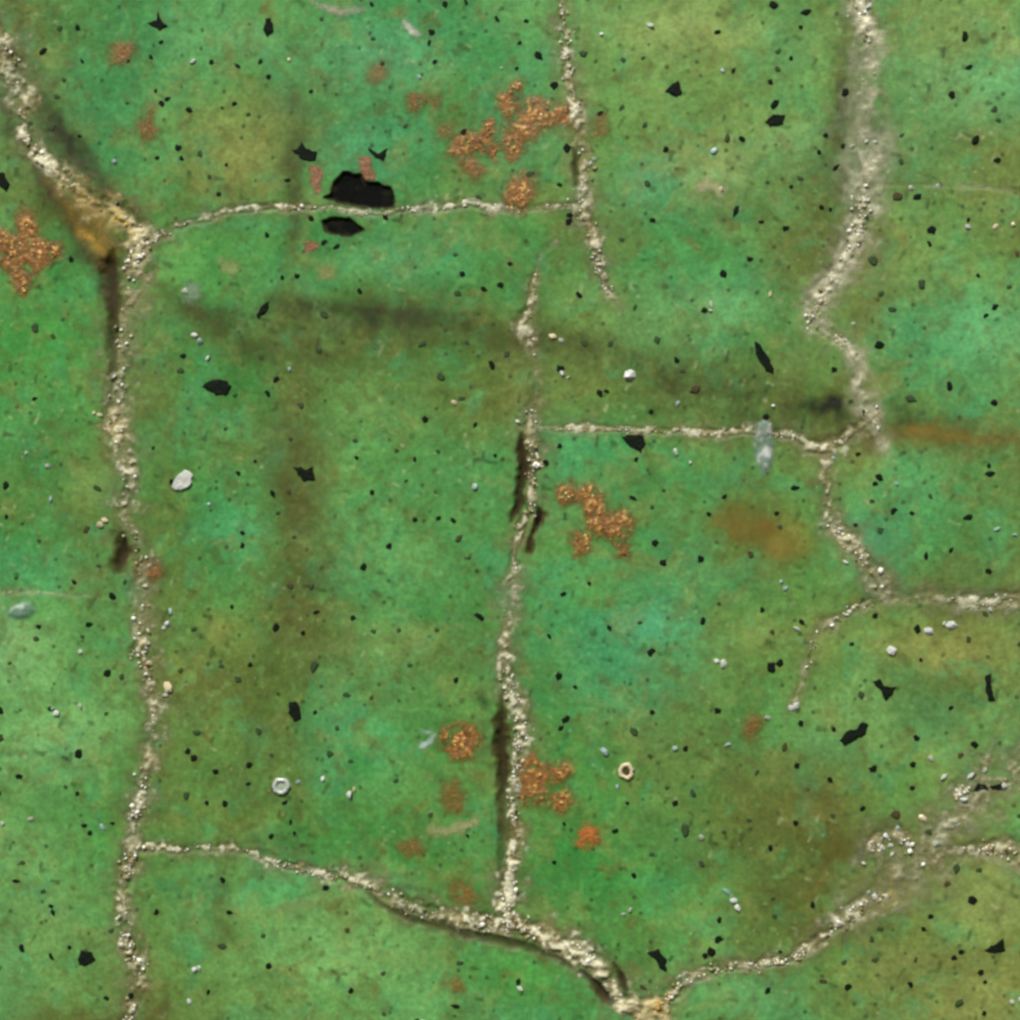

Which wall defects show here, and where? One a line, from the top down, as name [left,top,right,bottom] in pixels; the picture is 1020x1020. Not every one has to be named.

crack [847,0,882,45]
crack [862,59,878,80]
corrosion [439,81,570,178]
corrosion [0,207,61,296]
corrosion [504,171,535,213]
crack [804,92,881,362]
crack [0,5,615,593]
corrosion [556,479,635,557]
crack [116,372,1020,1020]
corrosion [441,721,481,760]
corrosion [520,753,573,813]
corrosion [577,826,599,847]